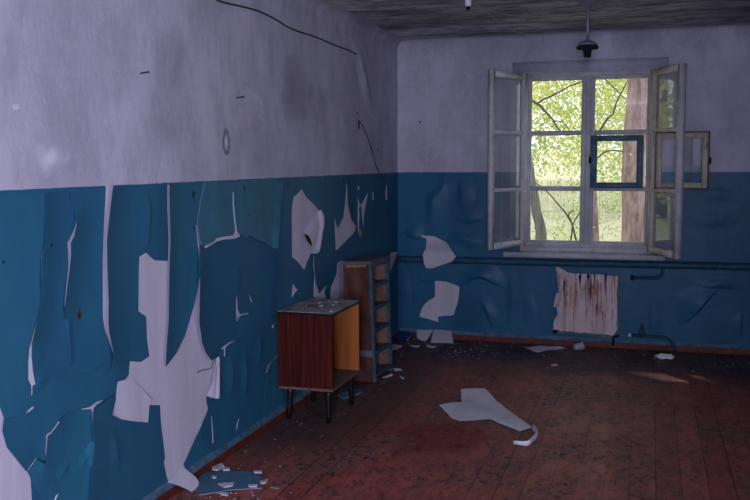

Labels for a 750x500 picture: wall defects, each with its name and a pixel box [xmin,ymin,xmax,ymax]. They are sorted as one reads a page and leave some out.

peeling [553,267,621,339]